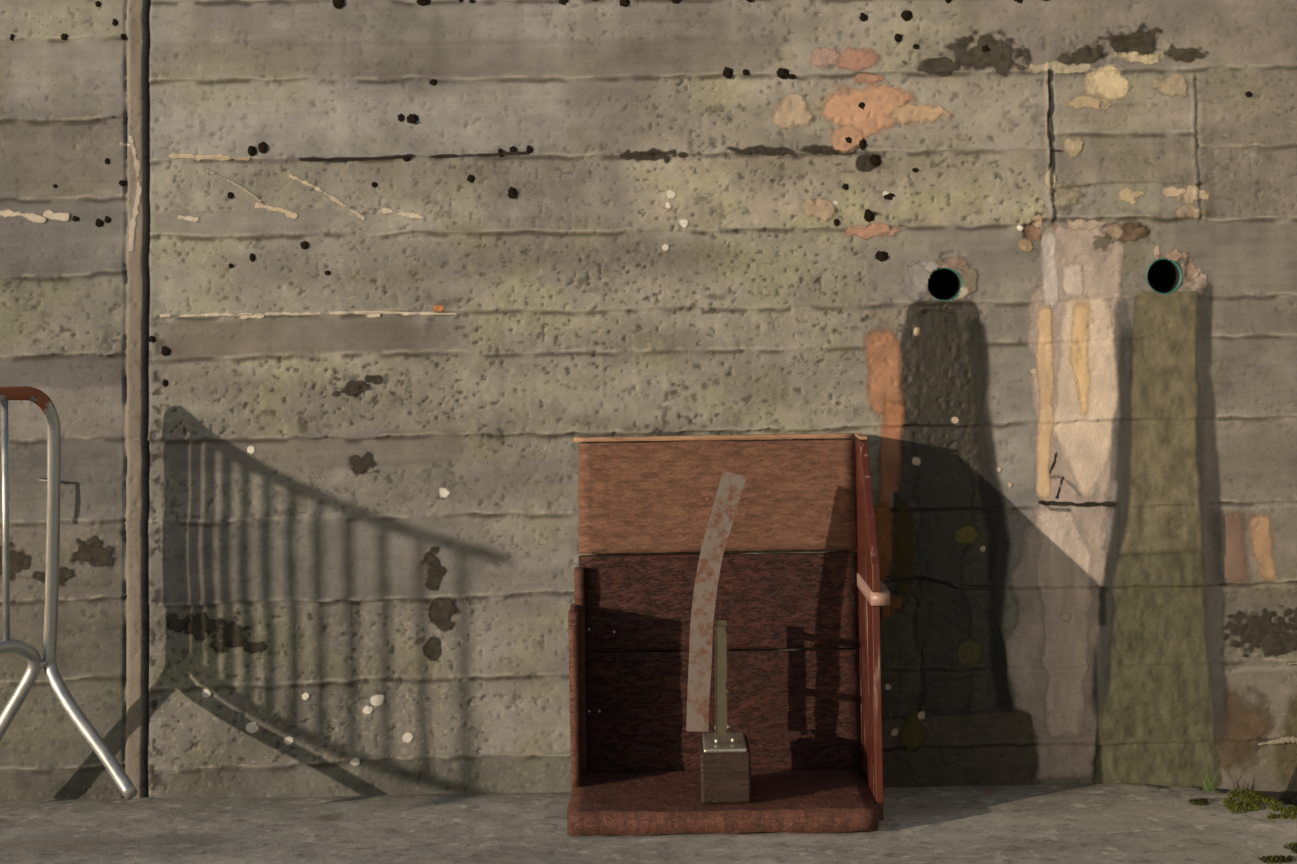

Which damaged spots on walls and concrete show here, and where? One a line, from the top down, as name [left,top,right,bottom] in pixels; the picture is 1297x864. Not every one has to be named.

crack [1047,69,1059,201]
peeling [1023,51,1187,110]
rust [865,330,904,581]
water stain [880,222,1297,789]
water stain [1276,696,1297,806]